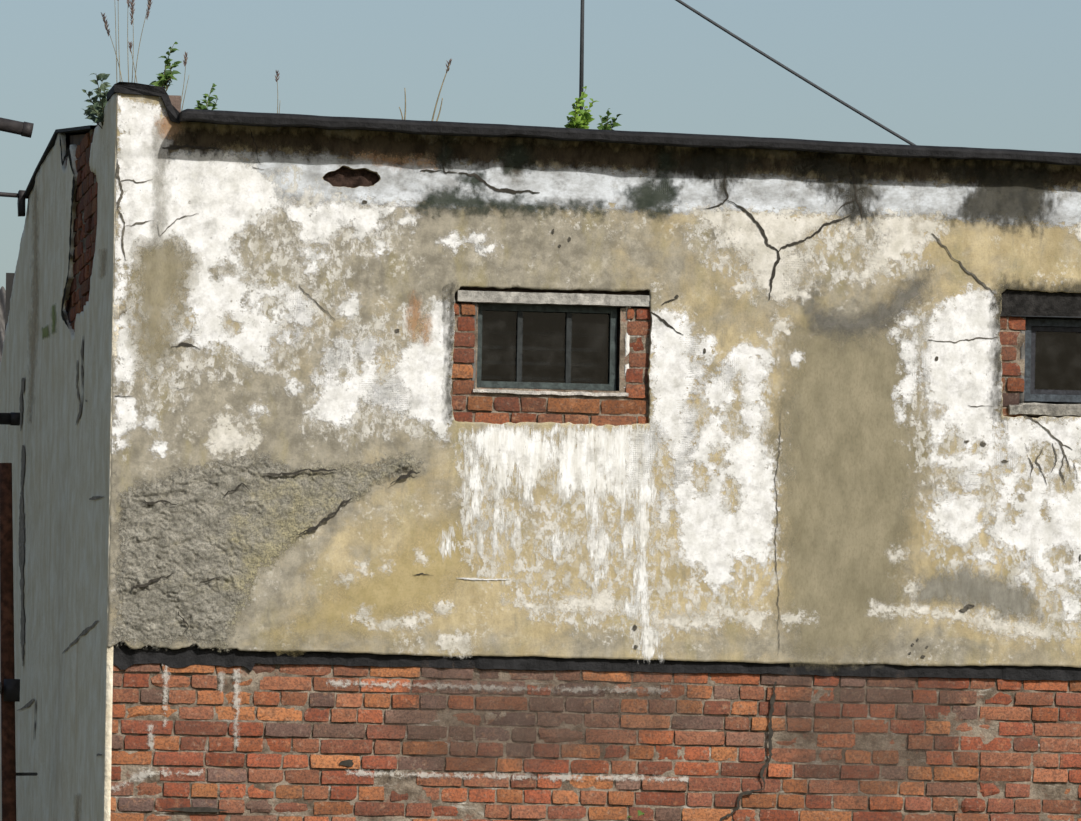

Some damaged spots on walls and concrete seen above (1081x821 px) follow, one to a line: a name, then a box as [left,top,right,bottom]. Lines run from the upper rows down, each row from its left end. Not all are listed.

flaking render [60,123,99,332]
crack [421,140,540,194]
water stain [168,126,1081,230]
crack [705,162,867,300]
crack [931,233,994,294]
peeling [1032,185,1081,241]
peeling [112,95,1015,659]
crack [928,336,1000,344]
water stain [113,269,1081,749]
peeling [867,283,1081,655]
crack [1024,415,1077,485]
water stain [347,770,583,781]